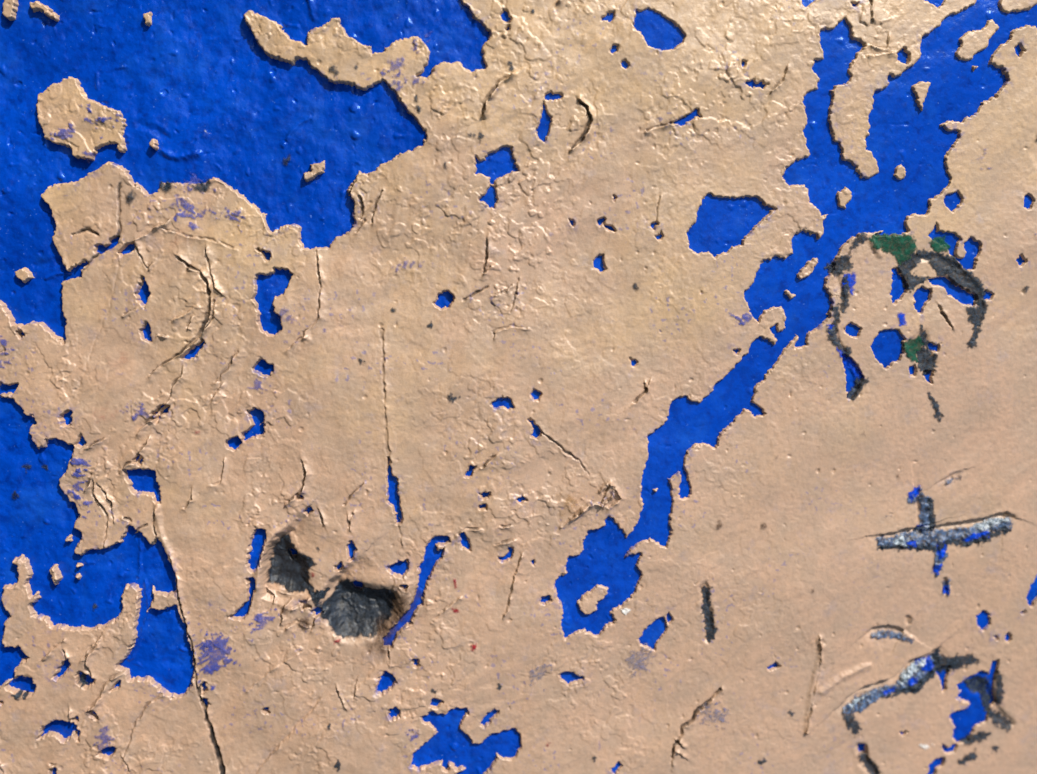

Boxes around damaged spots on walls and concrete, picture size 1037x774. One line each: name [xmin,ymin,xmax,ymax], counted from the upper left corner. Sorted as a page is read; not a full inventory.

peeling [0,0,490,340]
crack [167,264,214,362]
peeling [254,359,274,375]
peeling [541,0,1037,644]
peeling [0,384,208,706]
peeling [337,540,356,569]
peeling [41,716,80,738]
crack [176,580,225,774]
peeling [411,698,521,774]
peeling [639,613,672,649]
crack [672,688,721,752]
peeling [842,650,1014,774]